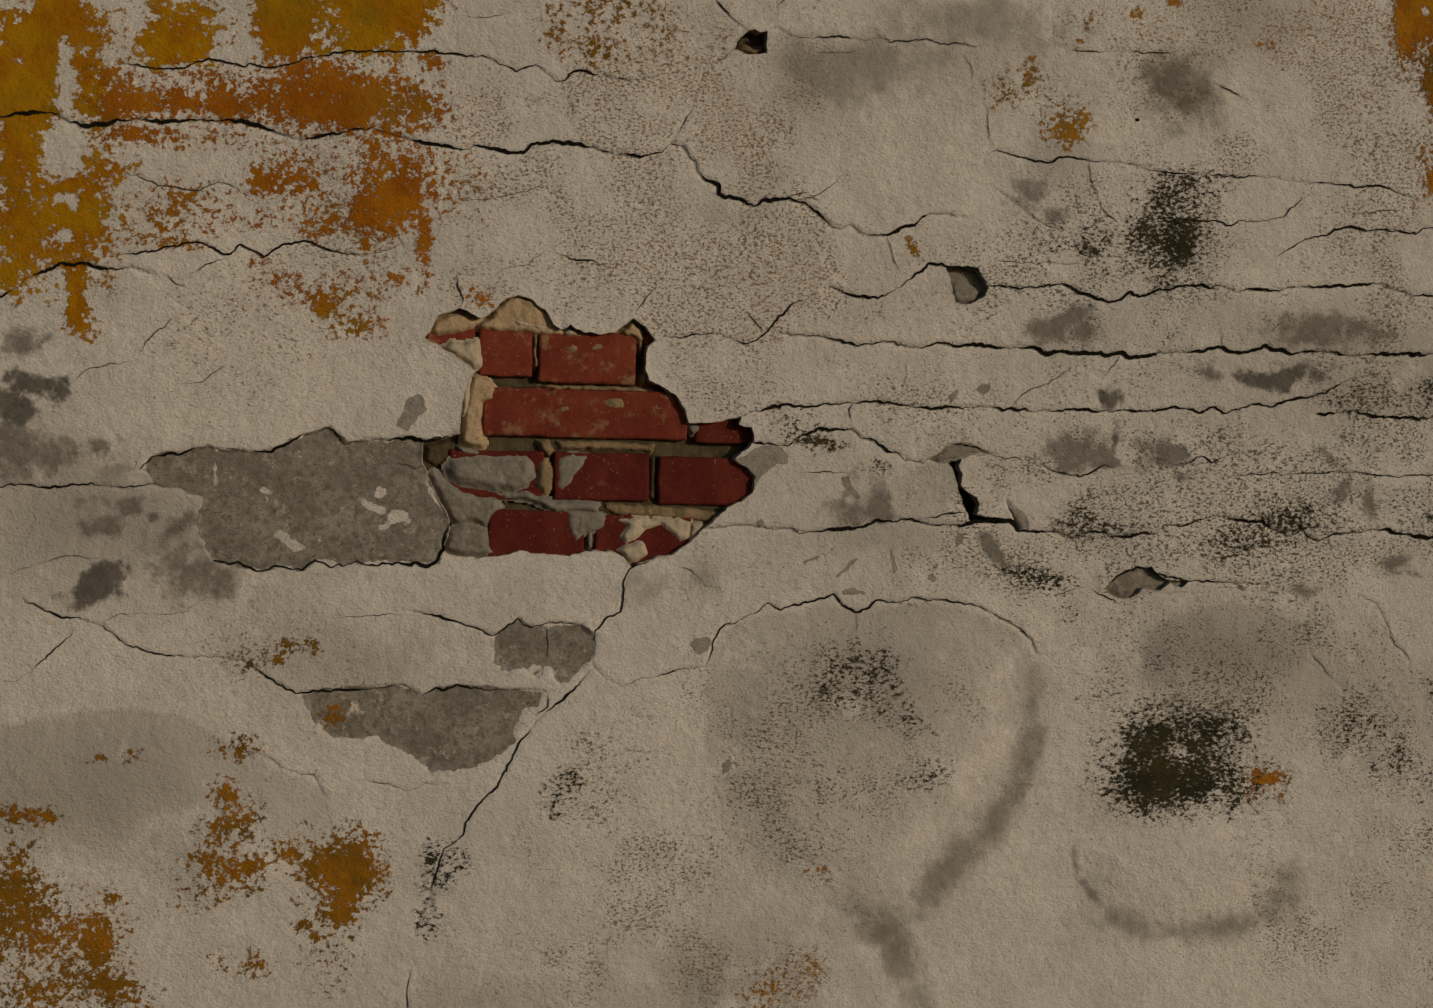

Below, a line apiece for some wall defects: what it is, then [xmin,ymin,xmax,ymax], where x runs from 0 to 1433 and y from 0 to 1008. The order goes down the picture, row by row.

hole [735,29,768,54]
corrosion [1387,0,1433,122]
corrosion [1412,143,1433,205]
crack [0,0,1433,481]
spalling [946,267,989,305]
spalling [146,294,788,572]
crack [706,512,1433,603]
spalling [1104,568,1188,600]
peeling [303,622,594,772]